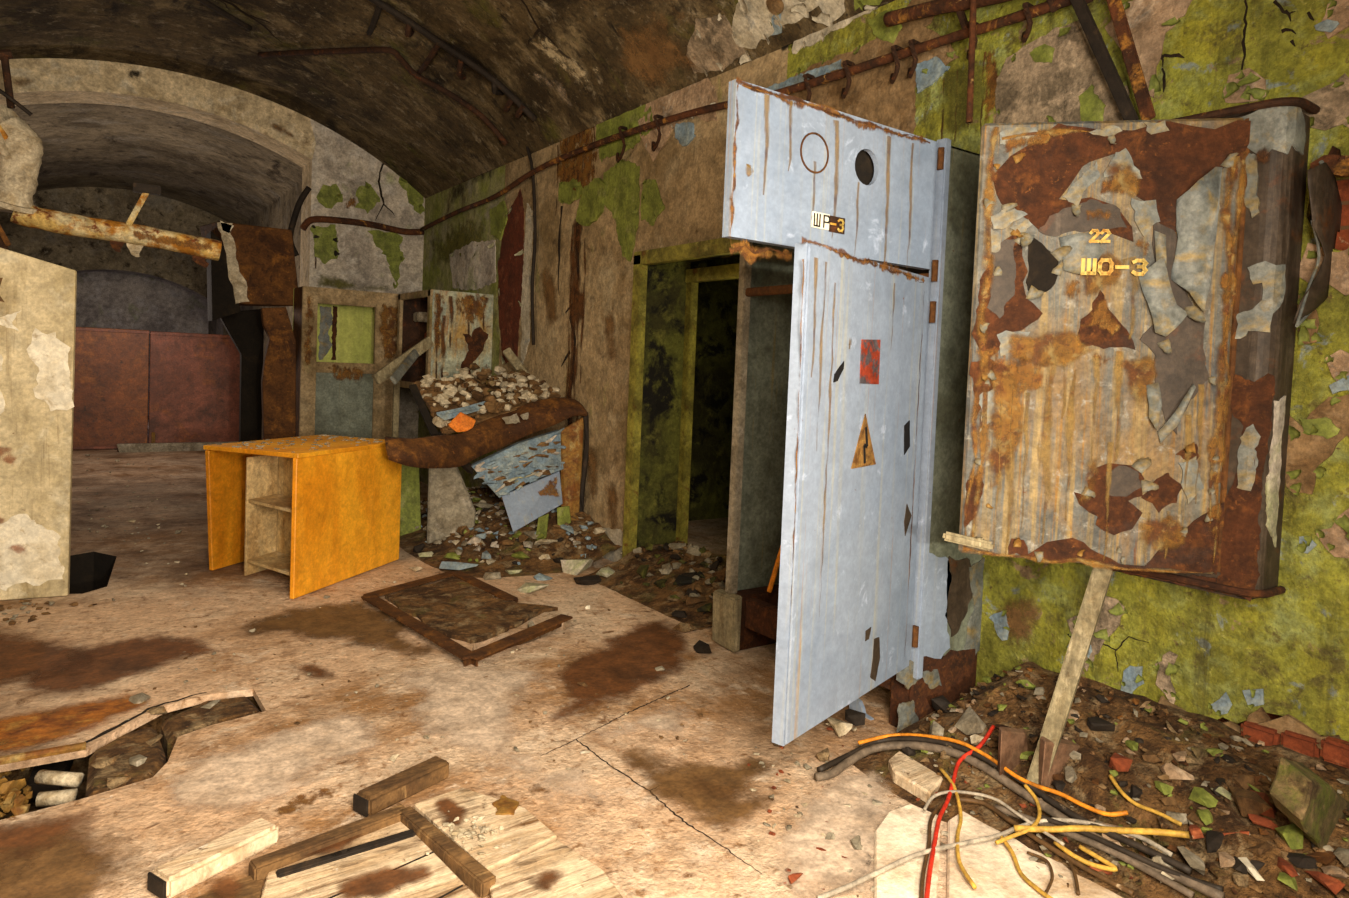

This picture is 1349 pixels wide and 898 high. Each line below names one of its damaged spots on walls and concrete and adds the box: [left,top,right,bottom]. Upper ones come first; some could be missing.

peeling [638,0,959,162]
peeling [1285,243,1349,496]
peeling [1297,508,1349,558]
damp [0,634,212,692]
damp [554,622,686,717]
damp [605,711,682,736]
spalling [1208,689,1349,769]
damp [624,749,771,827]